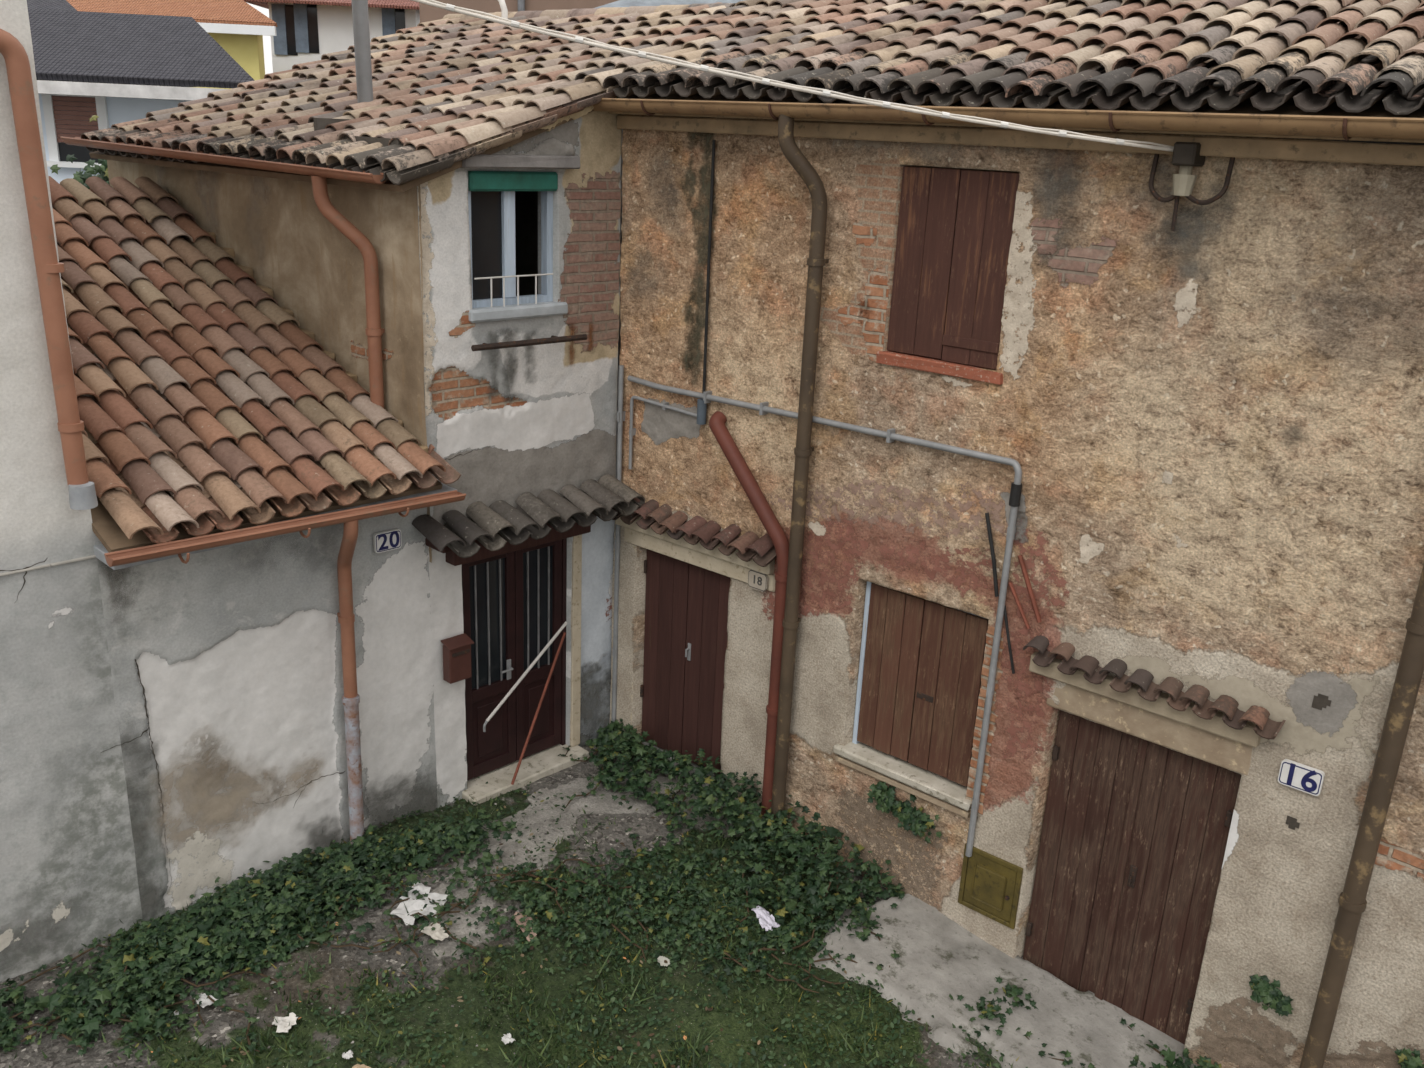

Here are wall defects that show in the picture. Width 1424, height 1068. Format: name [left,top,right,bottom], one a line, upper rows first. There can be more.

spalling [417,182,527,421]
spalling [558,171,621,353]
water stain [683,117,716,381]
peeling [135,609,344,908]
peeling [355,541,467,828]
peeling [763,479,1070,816]
spalling [1375,839,1424,882]